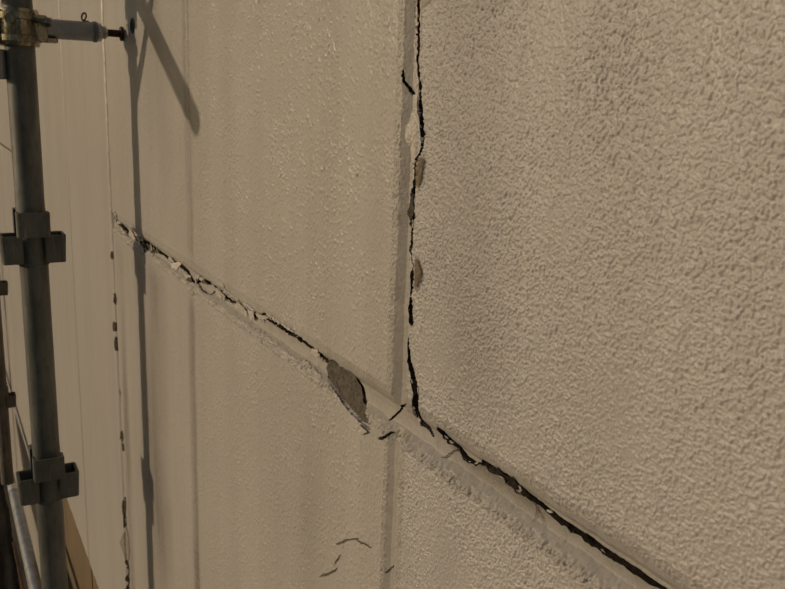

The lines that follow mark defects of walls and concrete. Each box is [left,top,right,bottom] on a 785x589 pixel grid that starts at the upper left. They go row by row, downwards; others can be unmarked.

crack [116,215,330,363]
peeling [112,211,375,438]
crack [378,0,667,589]
crack [123,559,131,589]
crack [319,538,372,577]